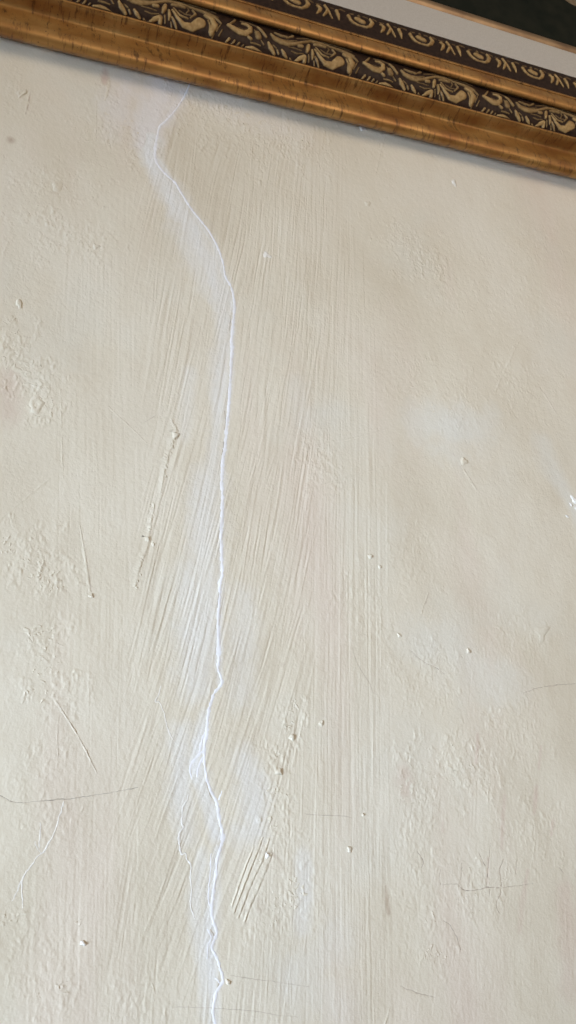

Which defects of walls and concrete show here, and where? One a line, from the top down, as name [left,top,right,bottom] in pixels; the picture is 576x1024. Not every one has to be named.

crack [153,84,309,1024]